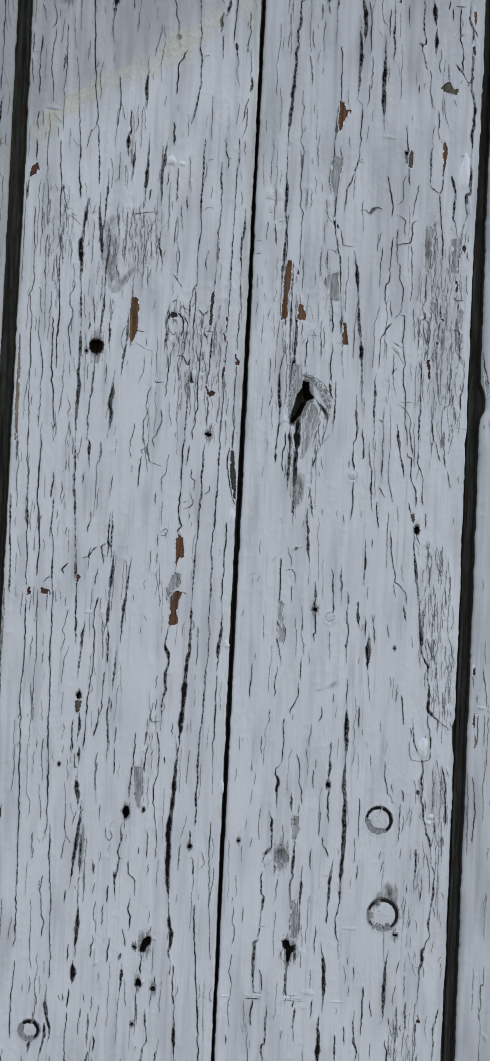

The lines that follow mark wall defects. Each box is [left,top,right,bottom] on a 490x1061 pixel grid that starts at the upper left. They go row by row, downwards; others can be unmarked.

peeling [337,101,352,132]
peeling [440,80,460,96]
peeling [128,294,141,348]
peeling [280,259,307,326]
peeling [289,363,303,413]
peeling [301,403,321,459]
crack [0,0,257,1061]
peeling [165,533,185,627]
crack [466,642,490,839]
crack [472,971,484,1060]